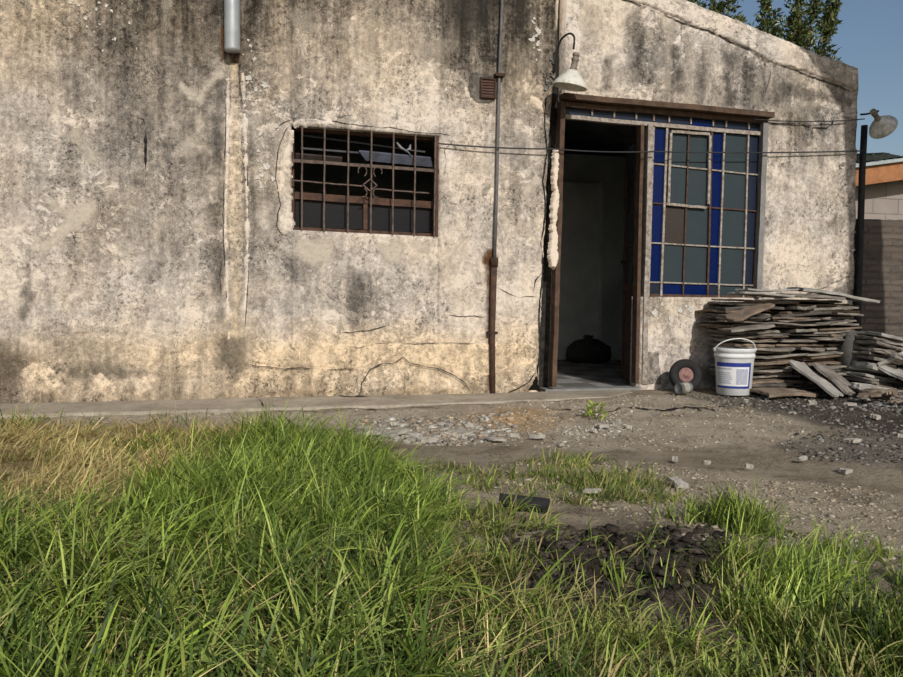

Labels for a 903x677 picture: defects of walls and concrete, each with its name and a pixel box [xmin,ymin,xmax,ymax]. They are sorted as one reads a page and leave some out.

crack [625,0,853,129]
corrosion [484,249,493,330]
crack [249,325,474,432]